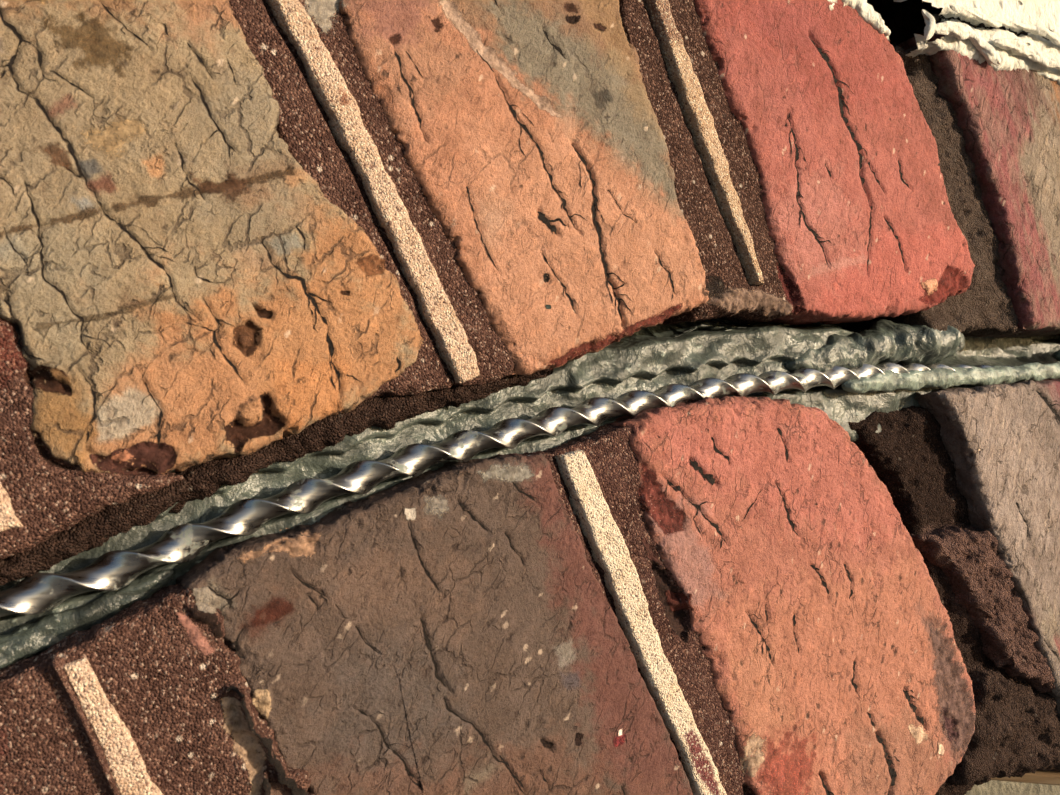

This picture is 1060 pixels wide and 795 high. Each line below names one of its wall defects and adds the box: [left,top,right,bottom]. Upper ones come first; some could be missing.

crack [0,1,245,384]
crack [476,49,635,329]
crack [809,37,909,272]
spalling [25,365,72,396]
spalling [31,431,71,470]
crack [0,177,116,448]
spalling [90,441,177,477]
spalling [233,307,273,357]
spalling [224,392,285,453]
crack [260,240,361,399]
crack [663,437,730,549]
spalling [928,621,976,756]